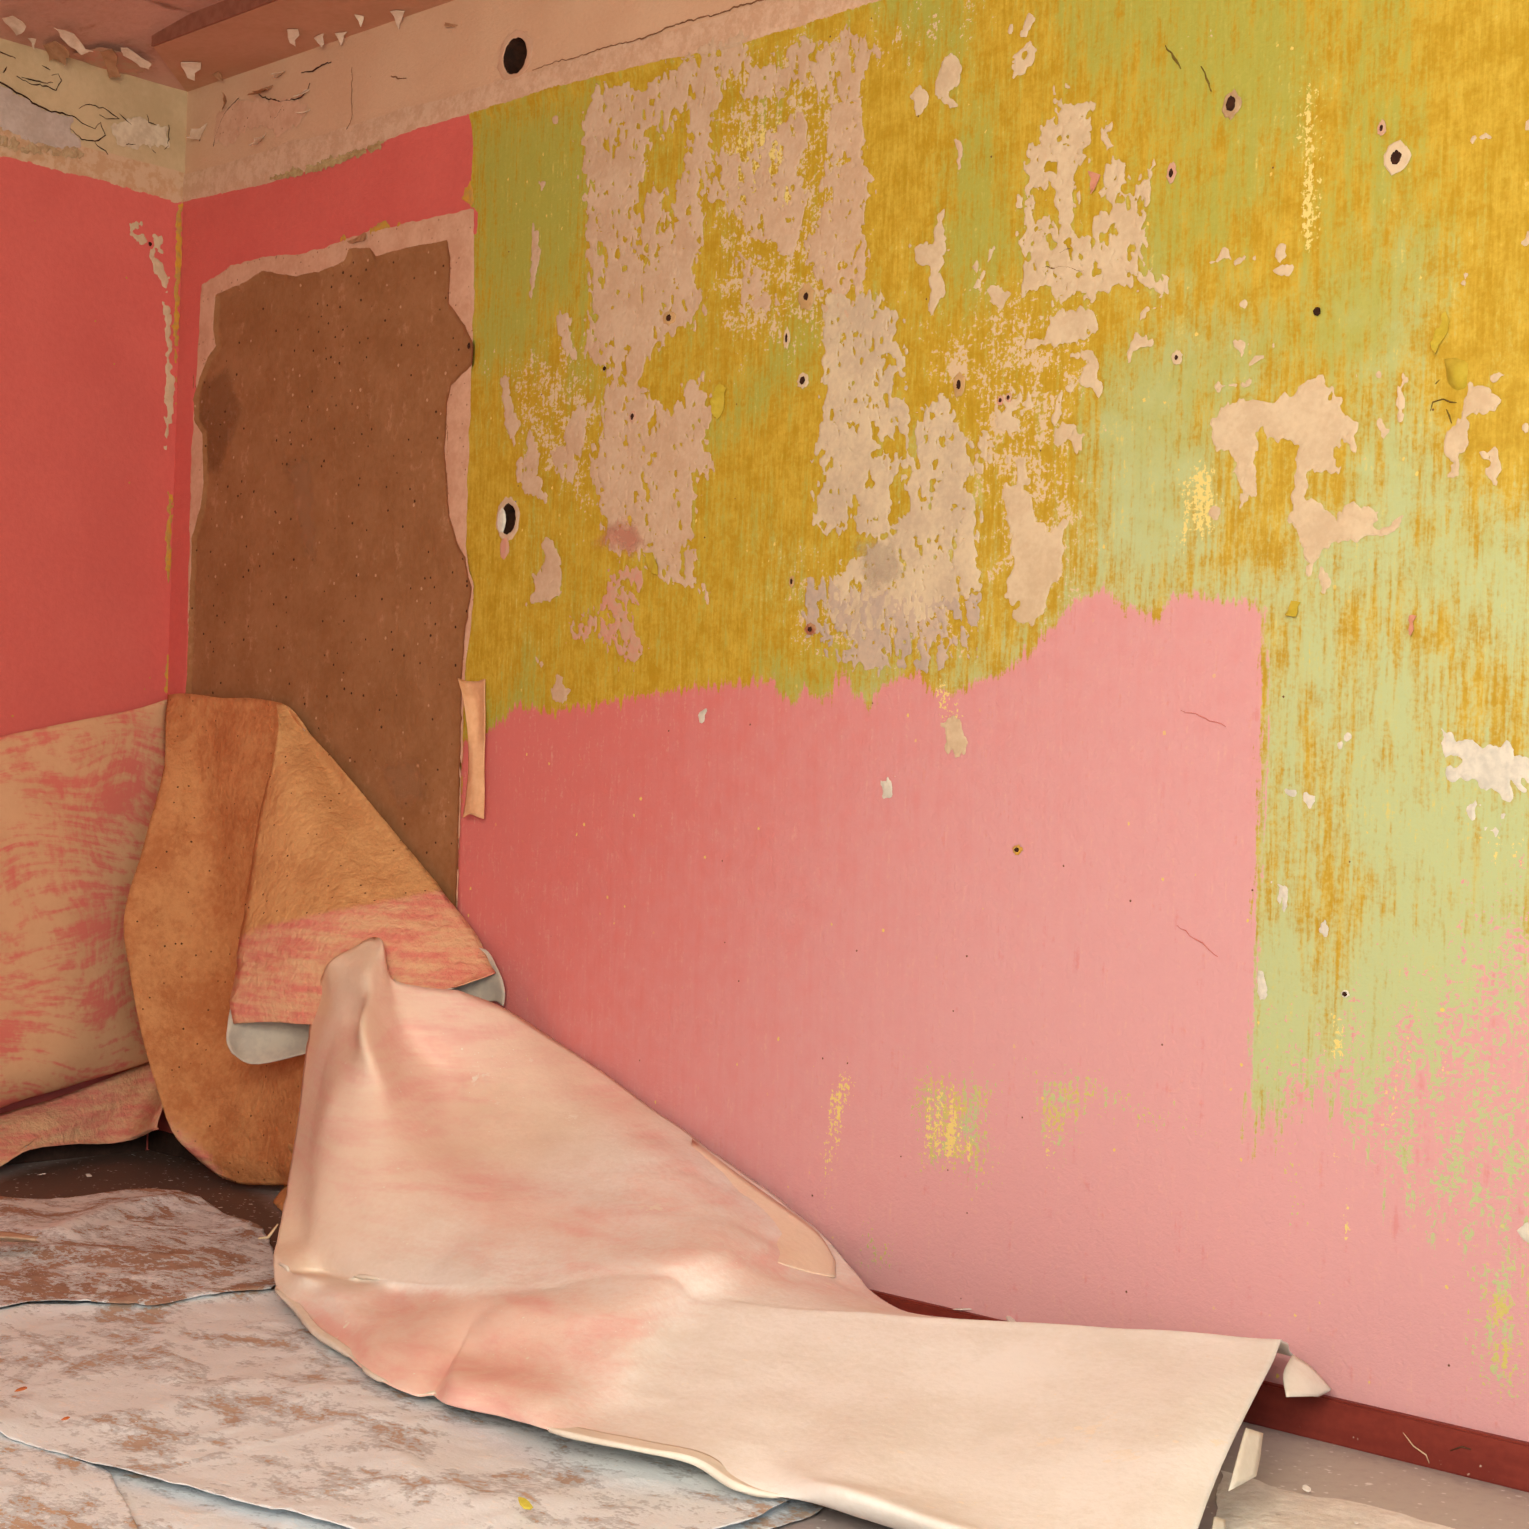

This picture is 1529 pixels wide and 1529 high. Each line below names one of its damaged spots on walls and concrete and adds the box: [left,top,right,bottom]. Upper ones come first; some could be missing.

peeling [2,16,155,78]
peeling [181,62,201,81]
peeling [287,14,364,47]
peeling [1008,13,1037,79]
peeling [0,86,84,159]
peeling [111,116,207,150]
peeling [496,23,1177,677]
peeling [1377,373,1408,439]
peeling [1209,339,1403,594]
flaking render [129,182,475,909]
peeling [535,657,571,704]
peeling [1441,728,1529,837]